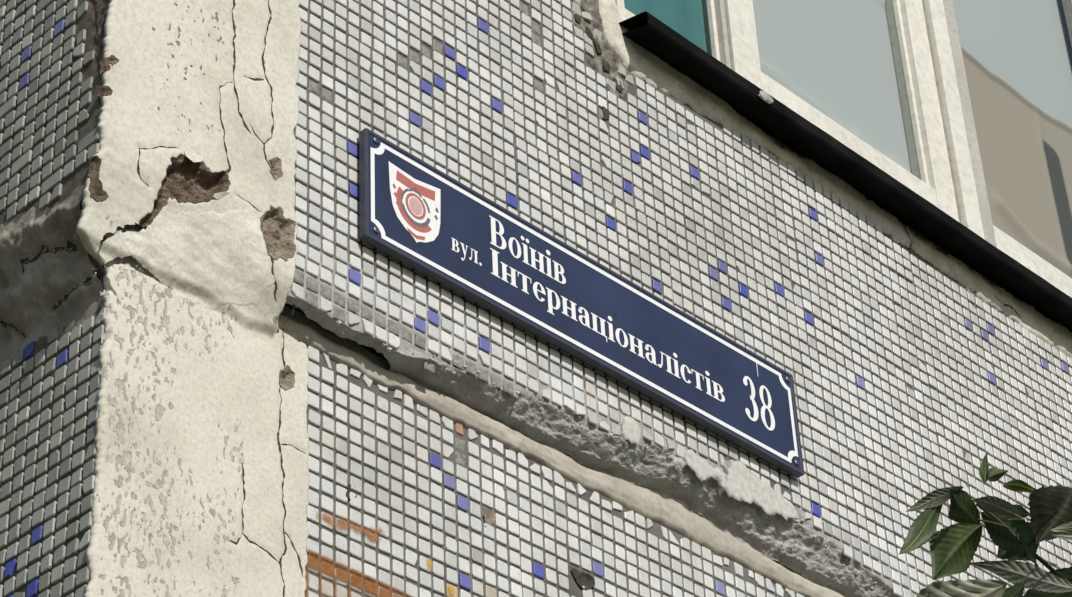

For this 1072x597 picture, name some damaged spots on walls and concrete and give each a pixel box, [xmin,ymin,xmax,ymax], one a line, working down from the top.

spalling [571,0,631,99]
crack [219,0,274,212]
spalling [598,106,610,122]
crack [137,146,178,186]
flaking render [140,151,231,227]
crack [229,255,303,597]
spalling [260,205,938,597]
rust [323,515,382,541]
rust [306,550,405,597]